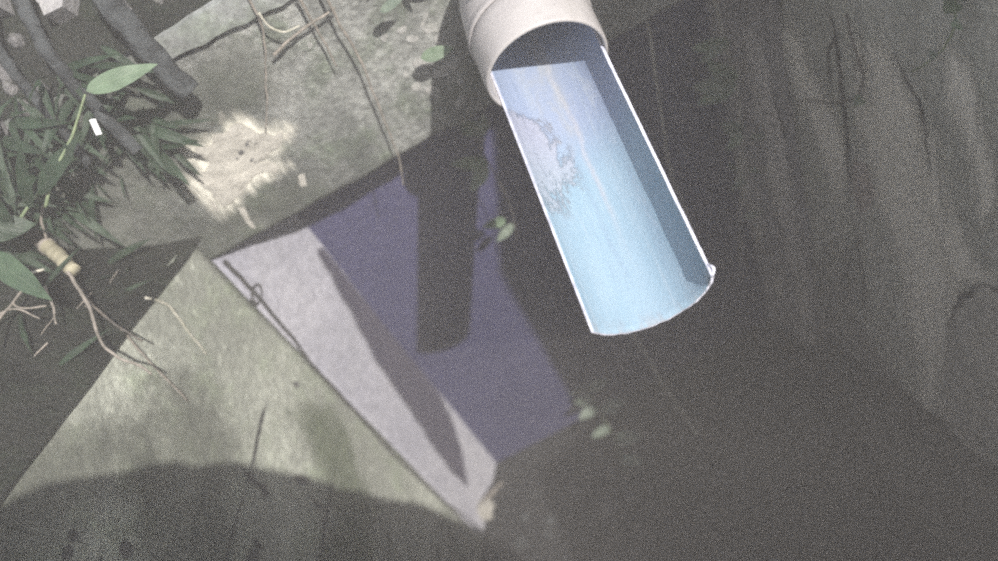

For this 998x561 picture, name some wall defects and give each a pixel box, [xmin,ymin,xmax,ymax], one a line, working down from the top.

crack [892,53,931,172]